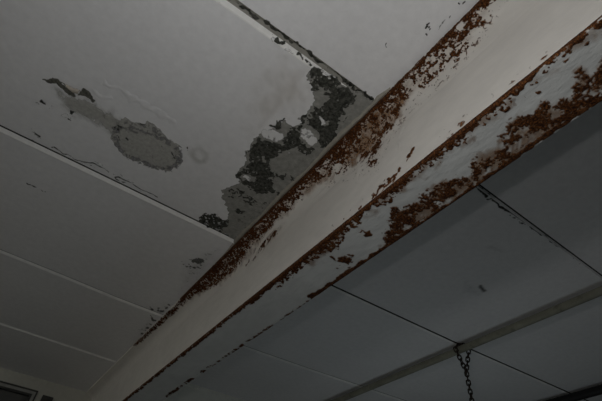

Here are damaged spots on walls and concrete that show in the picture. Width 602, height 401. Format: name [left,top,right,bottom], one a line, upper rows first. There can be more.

peeling [42,78,95,103]
damp [58,92,119,132]
spalling [111,117,183,172]
peeling [199,3,374,240]
corrosion [122,0,602,401]